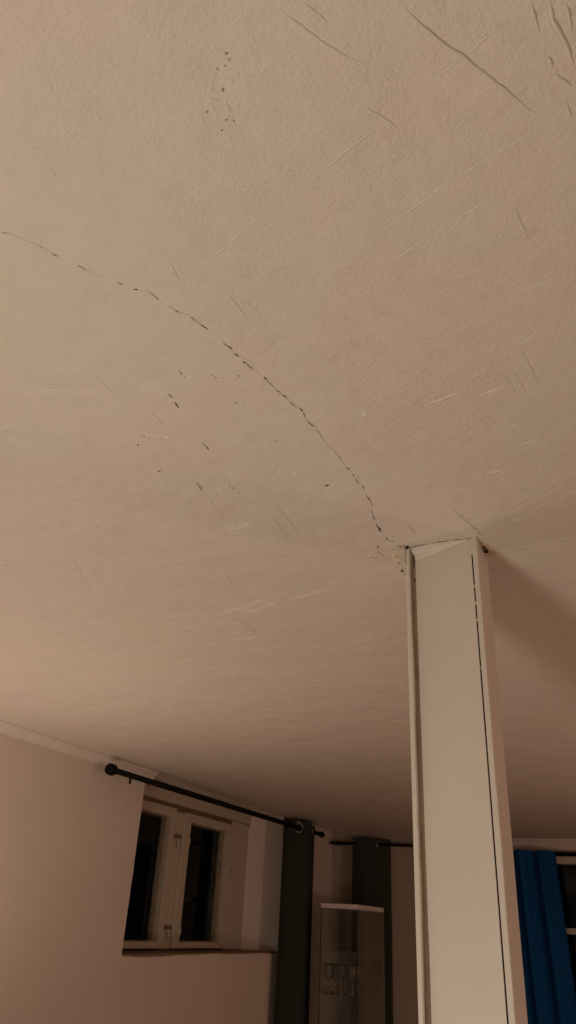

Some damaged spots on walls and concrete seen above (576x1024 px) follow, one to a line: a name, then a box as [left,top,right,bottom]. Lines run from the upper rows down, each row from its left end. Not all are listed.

crack [2,232,482,548]